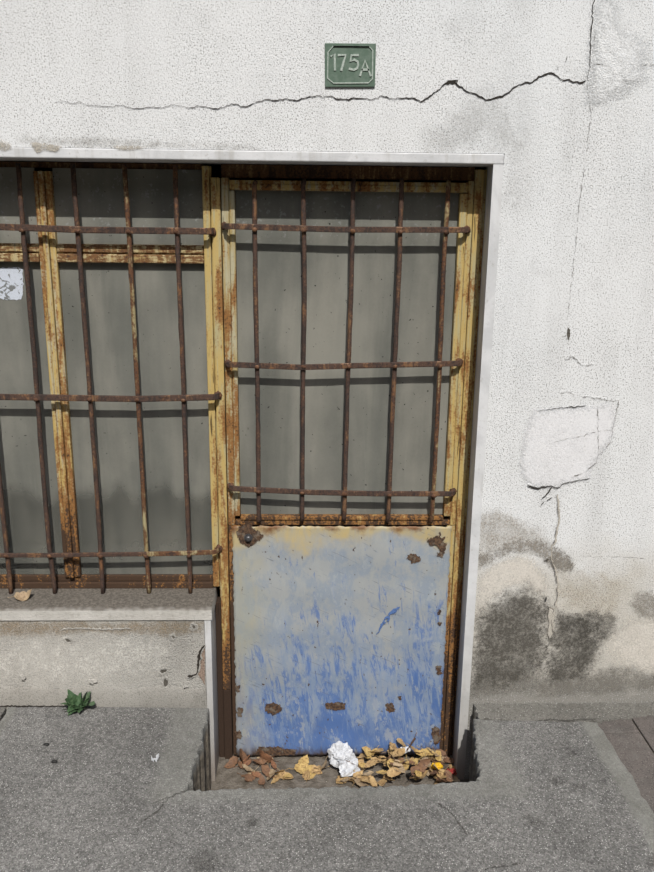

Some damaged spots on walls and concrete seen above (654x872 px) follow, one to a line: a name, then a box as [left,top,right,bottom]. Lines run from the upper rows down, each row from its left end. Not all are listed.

crack [58,0,600,314]
flaking render [519,390,621,489]
corrosion [236,524,264,547]
corrosion [427,536,447,557]
crack [541,487,560,641]
damp [472,515,654,686]
corrosion [265,702,284,716]
corrosion [325,702,346,711]
corrosion [431,725,441,745]